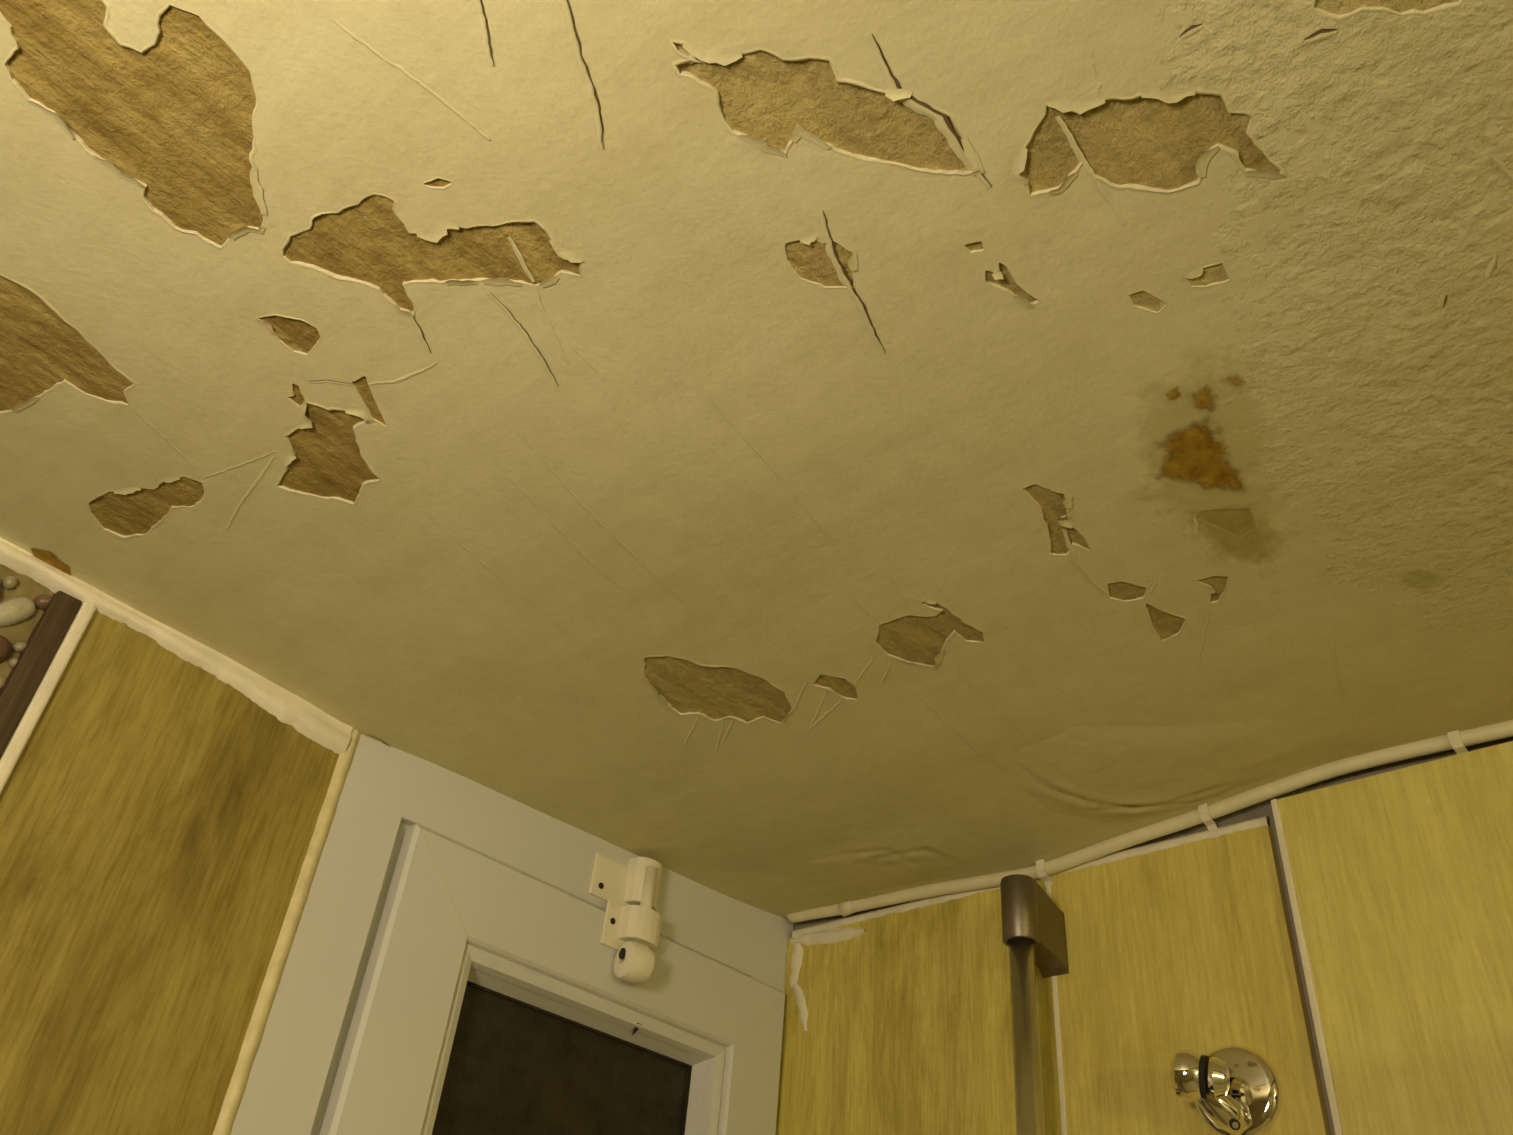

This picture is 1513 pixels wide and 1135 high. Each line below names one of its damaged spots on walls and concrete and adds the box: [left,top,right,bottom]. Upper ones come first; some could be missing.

peeling [0,0,267,250]
peeling [421,177,454,190]
peeling [475,0,495,67]
peeling [561,0,604,150]
peeling [669,34,992,189]
peeling [1010,88,1288,223]
flaking render [1304,0,1466,44]
peeling [0,192,585,539]
rust [1161,388,1242,490]
peeling [1021,482,1230,661]
peeling [1191,507,1258,543]
peeling [642,578,985,753]